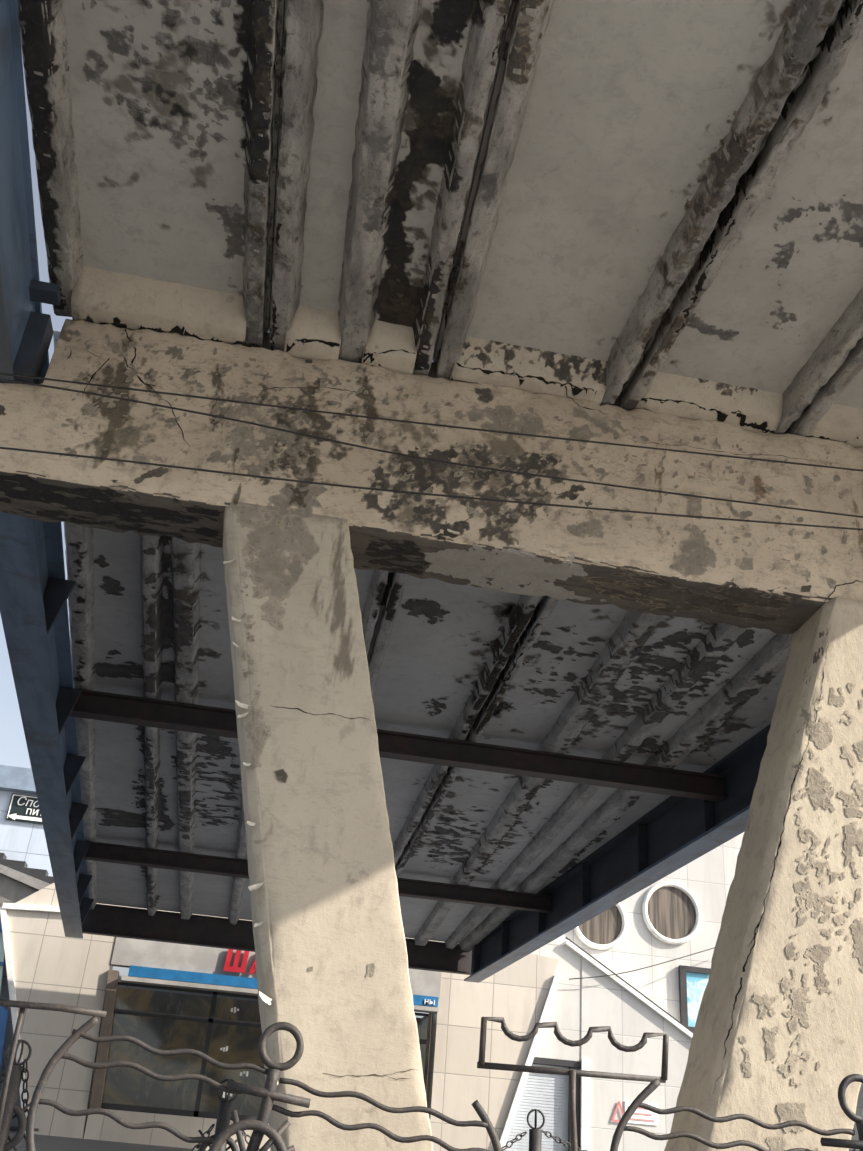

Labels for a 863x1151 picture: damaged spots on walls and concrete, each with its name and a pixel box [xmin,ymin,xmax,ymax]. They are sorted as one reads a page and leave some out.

crack [781,0,863,121]
crack [675,156,757,340]
peeling [61,0,863,840]
crack [451,362,859,461]
crack [274,706,369,720]
crack [713,647,828,1093]